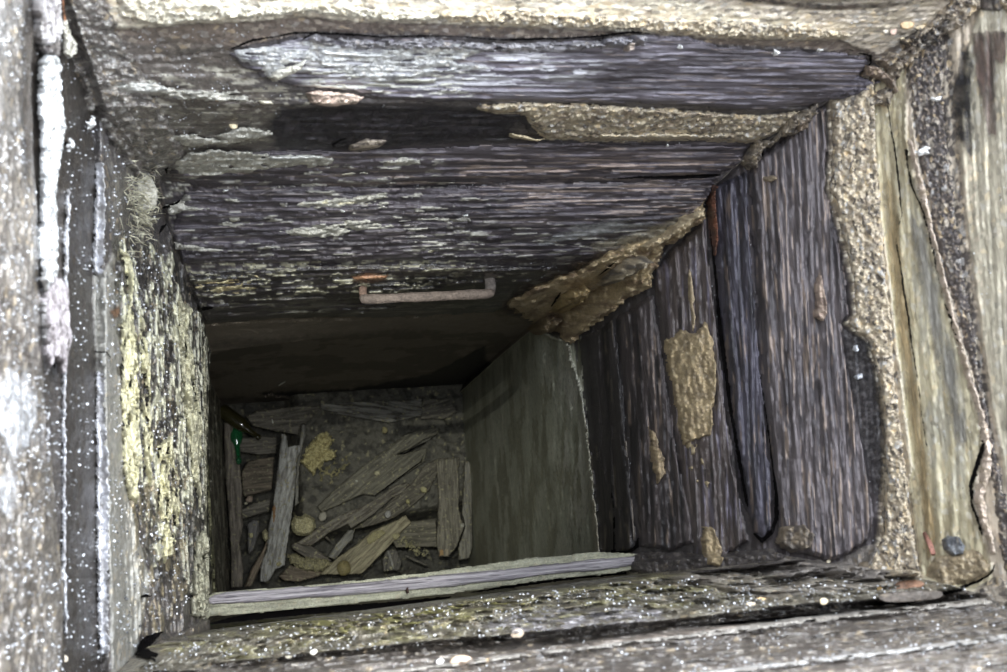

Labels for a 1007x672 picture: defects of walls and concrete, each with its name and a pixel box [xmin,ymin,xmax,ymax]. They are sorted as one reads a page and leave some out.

crack [231,31,649,49]
peeling [348,139,387,151]
water stain [195,275,259,294]
corrosion [353,273,387,282]